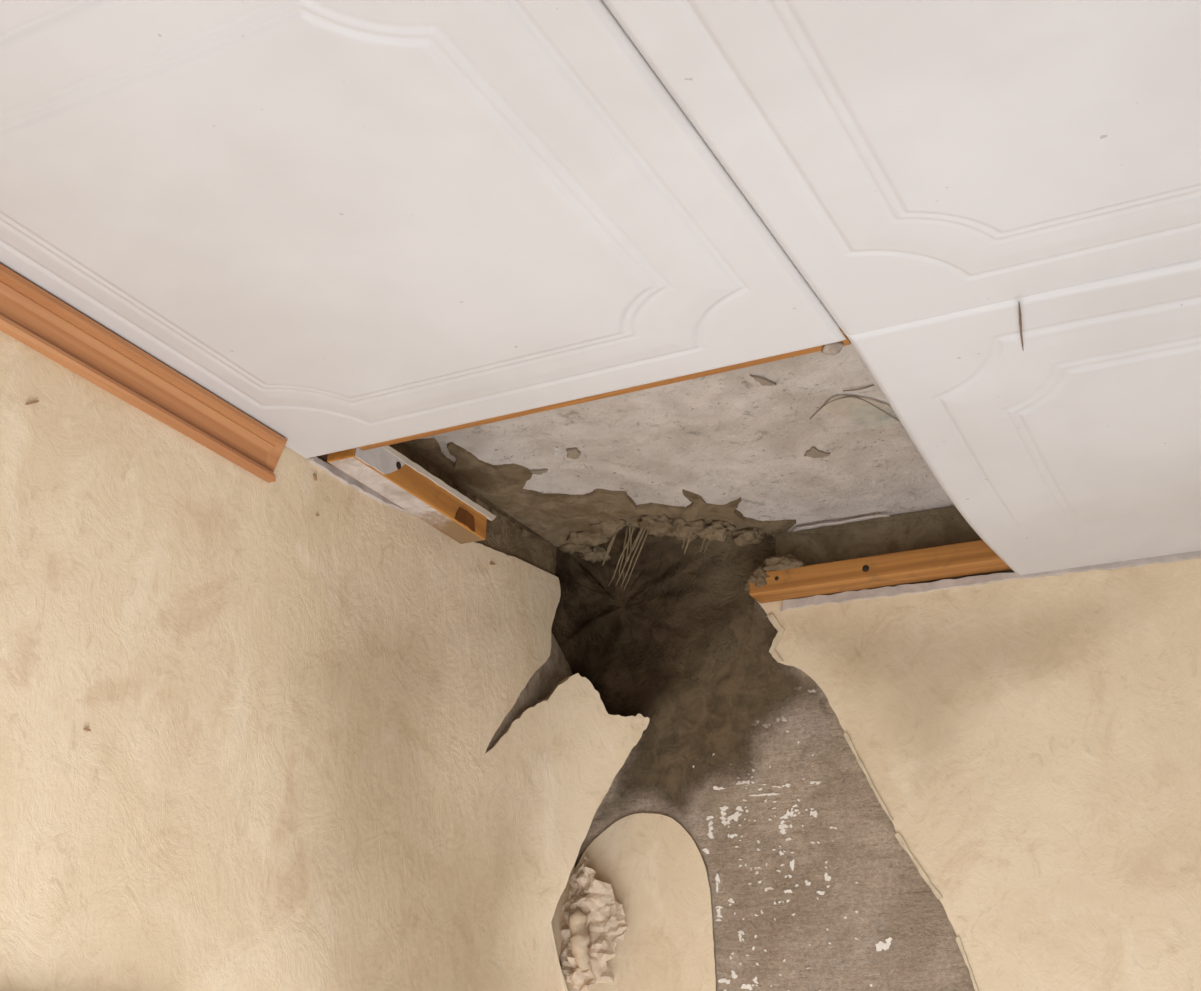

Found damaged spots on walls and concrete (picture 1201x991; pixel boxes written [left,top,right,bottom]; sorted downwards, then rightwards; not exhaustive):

crack [1017,302,1025,351]
spalling [750,374,776,386]
spalling [824,395,892,421]
flaking render [827,569,1014,595]
flaking render [389,438,982,991]
leakage [620,601,803,808]